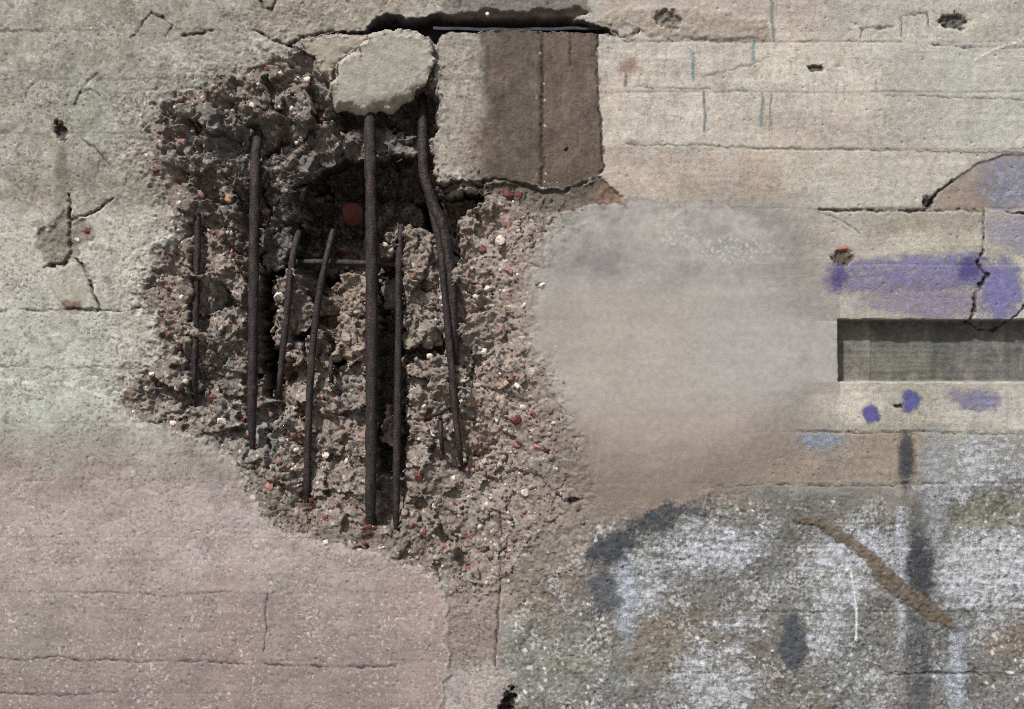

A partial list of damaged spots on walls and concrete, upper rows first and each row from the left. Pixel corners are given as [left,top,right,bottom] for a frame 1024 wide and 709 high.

crack [140,12,206,37]
crack [1,195,146,312]
corrosion [191,213,201,407]
corrosion [276,112,404,535]
spalling [122,32,622,598]
corrosion [417,94,467,469]
crack [824,181,952,232]
crack [966,210,1024,332]
leakage [585,498,779,646]
leakage [663,424,1024,709]
corrosion [792,515,956,628]